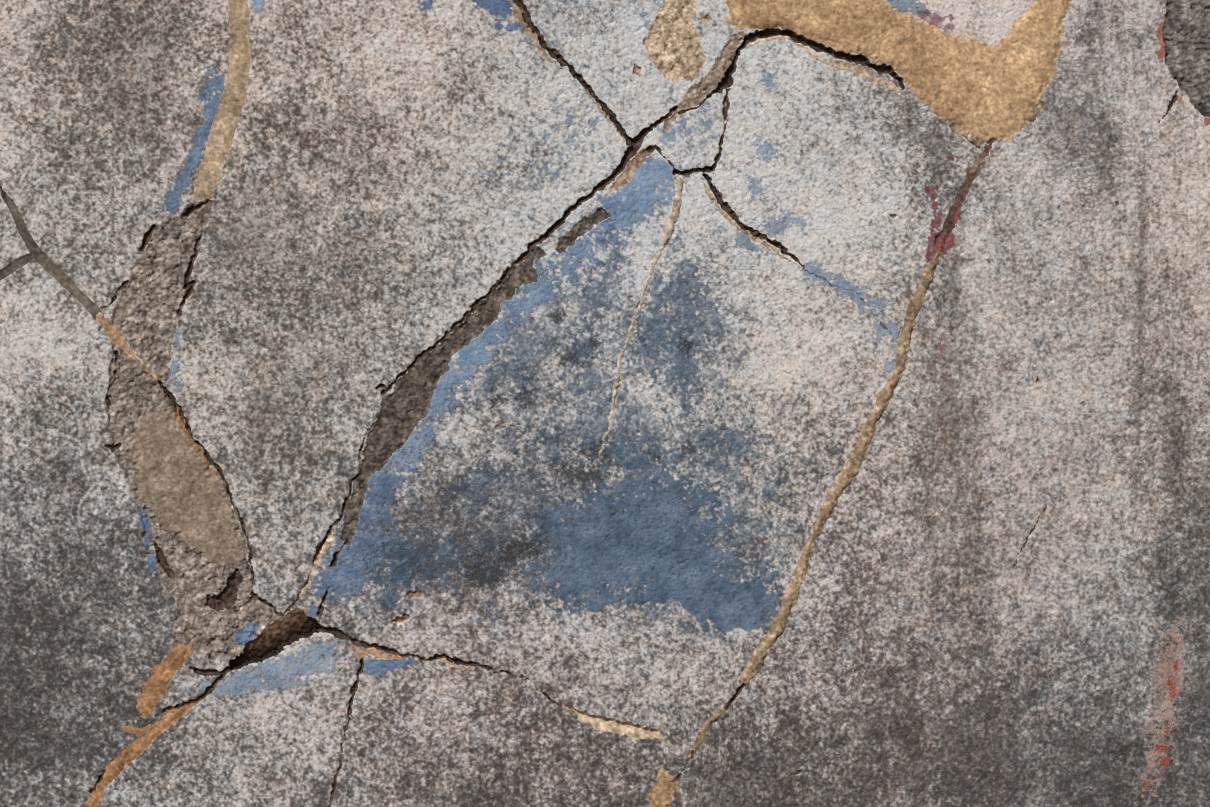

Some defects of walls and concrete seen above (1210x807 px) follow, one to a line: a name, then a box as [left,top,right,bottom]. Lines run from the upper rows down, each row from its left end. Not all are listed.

crack [105,350,119,408]
flaking render [107,0,784,699]
crack [154,0,905,807]
crack [1158,90,1178,123]